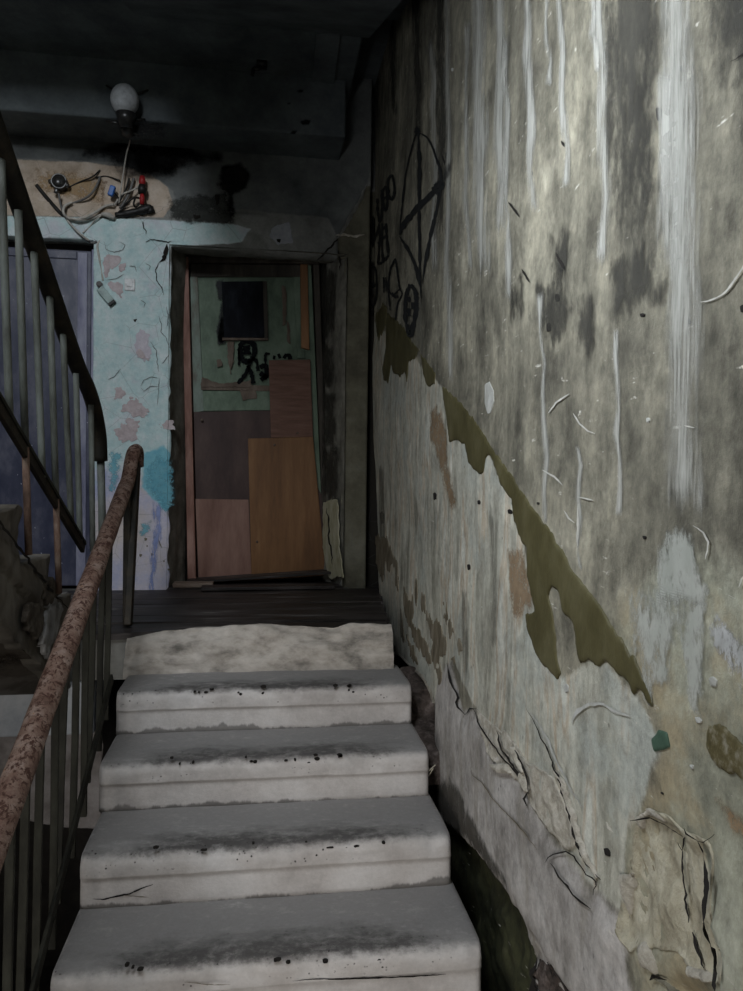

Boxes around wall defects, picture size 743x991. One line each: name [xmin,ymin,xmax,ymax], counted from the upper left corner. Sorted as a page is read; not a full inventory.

water stain [464,0,523,319]
water stain [523,0,536,205]
water stain [545,0,570,183]
water stain [536,231,568,353]
water stain [590,0,701,513]
flaking render [322,499,344,579]
peeling [382,313,654,707]
crack [96,884,153,900]
crack [447,665,474,715]
crack [472,709,601,909]
flaking render [529,944,569,991]
peeling [695,717,743,781]